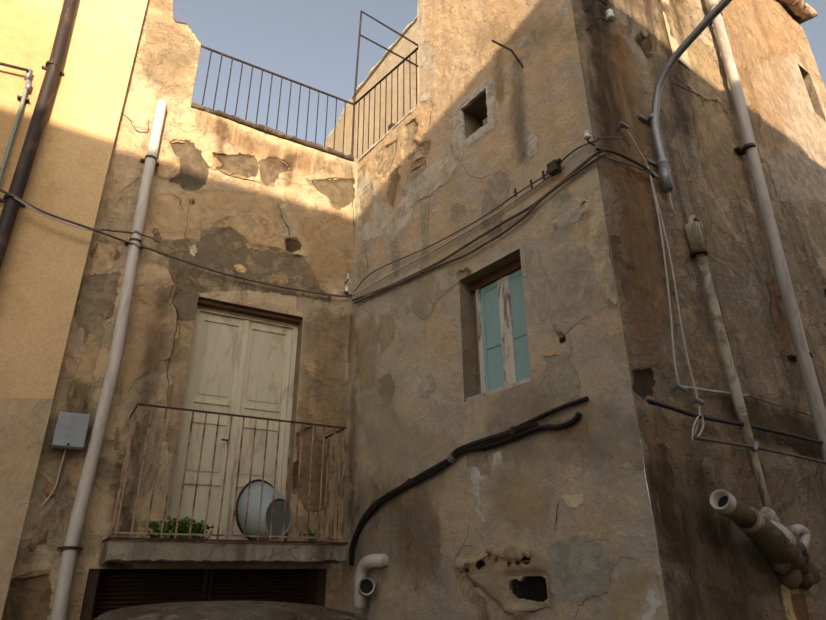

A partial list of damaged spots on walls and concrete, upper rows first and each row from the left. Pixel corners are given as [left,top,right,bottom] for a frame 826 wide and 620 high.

peeling [306,117,431,242]
crack [128,276,178,396]
peeling [152,139,331,455]